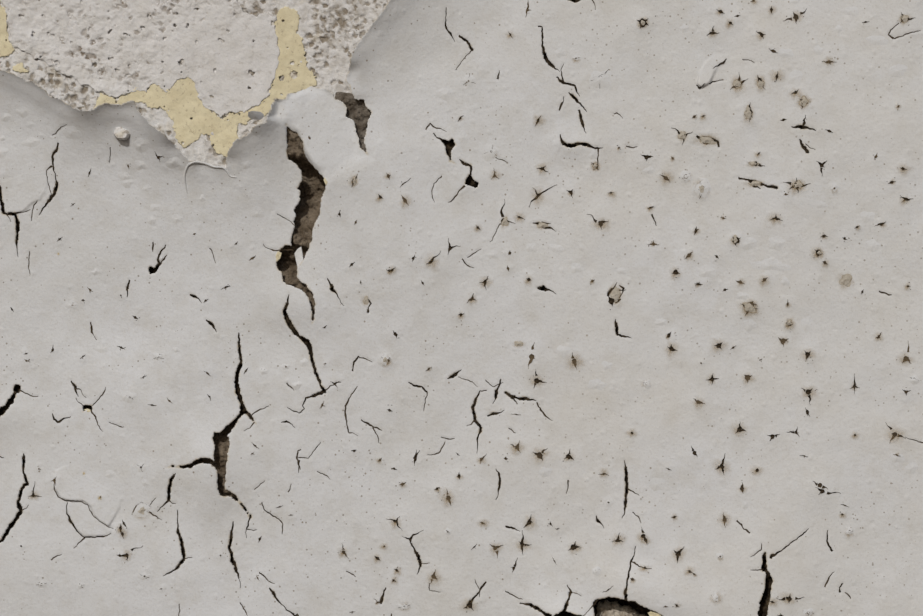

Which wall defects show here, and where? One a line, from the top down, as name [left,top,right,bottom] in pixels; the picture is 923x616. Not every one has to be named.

peeling [0,0,389,168]
crack [335,92,371,152]
crack [626,115,720,199]
crack [0,116,579,616]
crack [695,374,719,404]
crack [768,388,817,457]
crack [778,299,813,364]
crack [717,455,759,493]
spalling [520,546,662,616]
crack [723,481,851,616]